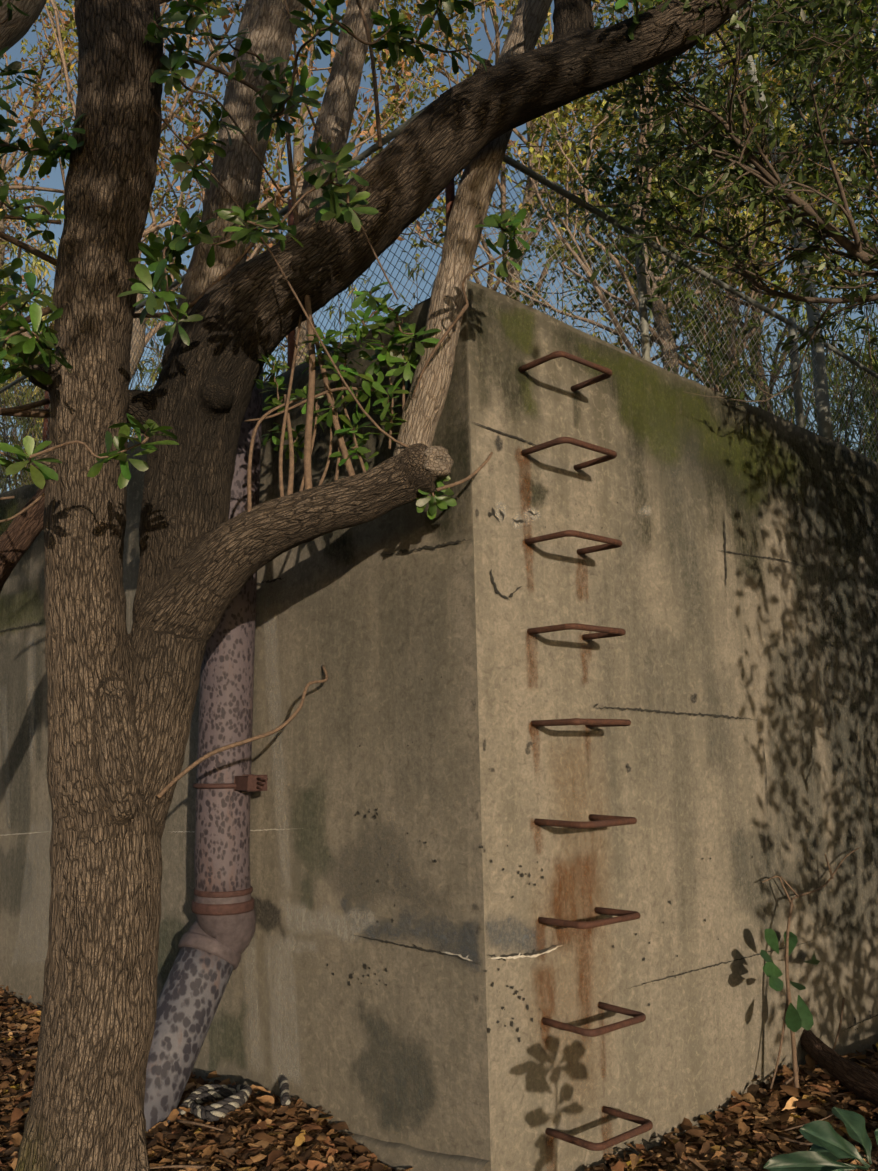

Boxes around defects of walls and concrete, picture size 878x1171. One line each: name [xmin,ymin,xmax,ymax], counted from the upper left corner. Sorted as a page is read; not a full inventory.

crack [385,539,468,555]
crack [488,507,537,523]
water stain [564,331,878,938]
crack [594,704,768,814]
water stain [211,899,562,1080]
crack [354,935,558,965]